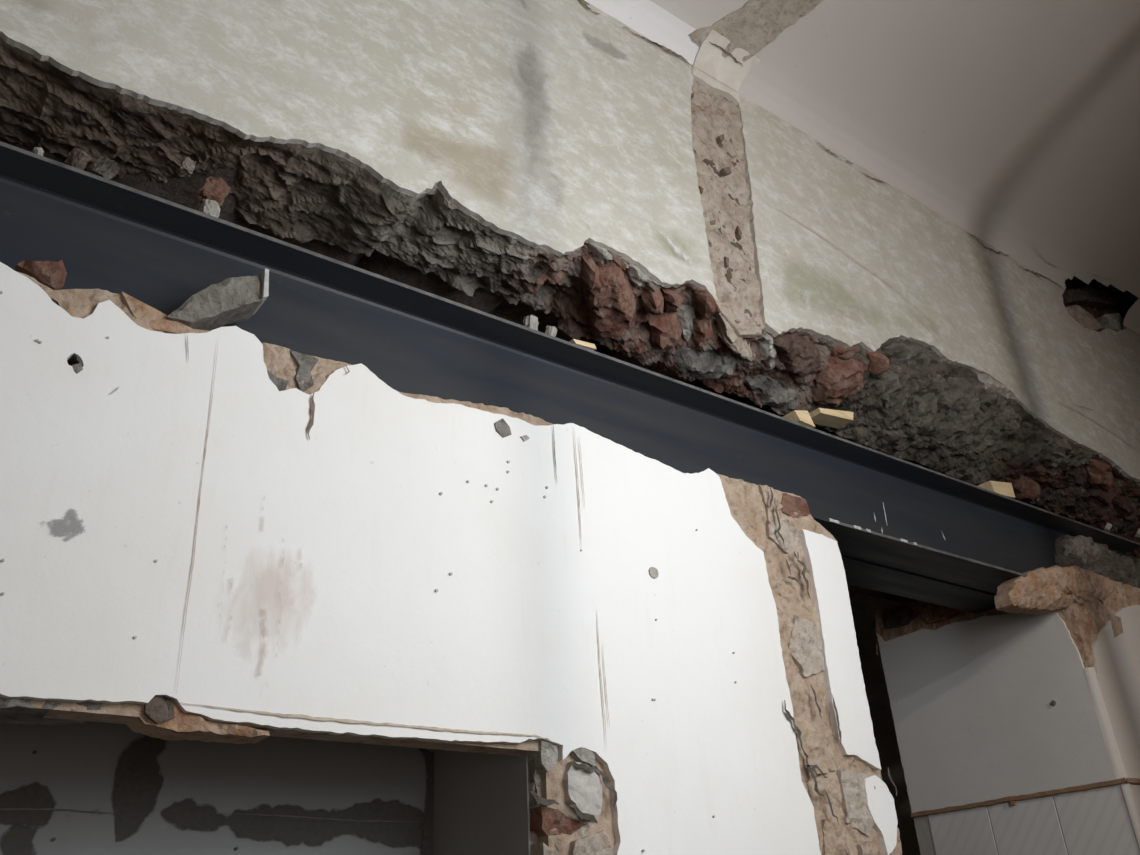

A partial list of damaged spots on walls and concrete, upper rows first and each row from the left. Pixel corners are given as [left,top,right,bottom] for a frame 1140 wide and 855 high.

spalling [0,37,1140,671]
spalling [0,697,102,726]
spalling [126,696,270,744]
spalling [717,474,902,855]
spalling [528,741,617,855]